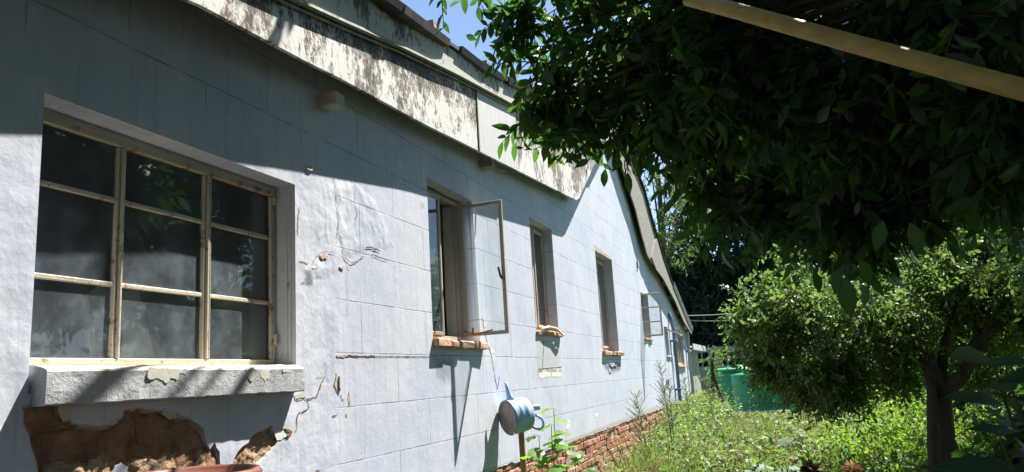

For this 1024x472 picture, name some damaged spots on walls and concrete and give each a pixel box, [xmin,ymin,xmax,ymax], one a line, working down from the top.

crack [334,177,387,285]
peeling [147,367,187,383]
peeling [245,368,291,382]
peeling [332,374,350,417]
crack [293,354,430,431]
flaking render [21,404,220,472]
flaking render [233,426,292,465]